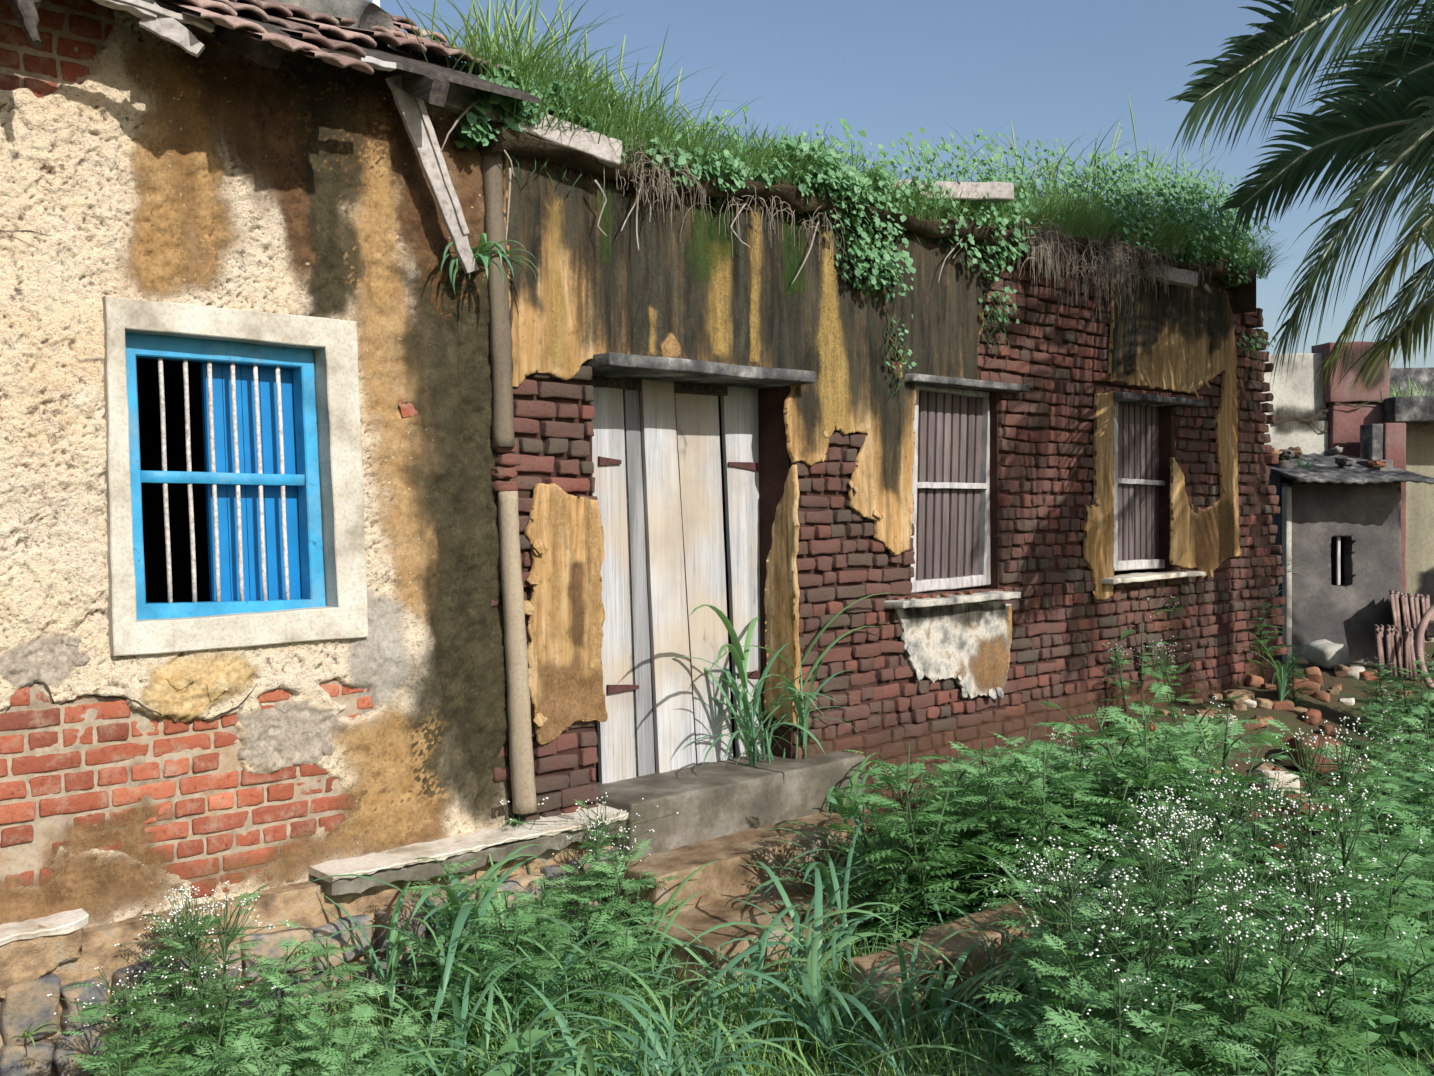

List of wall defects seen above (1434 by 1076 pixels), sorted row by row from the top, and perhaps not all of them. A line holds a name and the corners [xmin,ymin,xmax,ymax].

spalling [0,0,115,98]
spalling [0,635,373,898]
water stain [128,32,509,774]
flaking render [524,483,607,745]
water stain [569,562,584,645]
flaking render [502,154,772,387]
water stain [504,153,1008,497]
flaking render [764,298,916,724]
flaking render [895,601,1011,699]
water stain [904,602,1009,627]
flaking render [1083,263,1241,600]